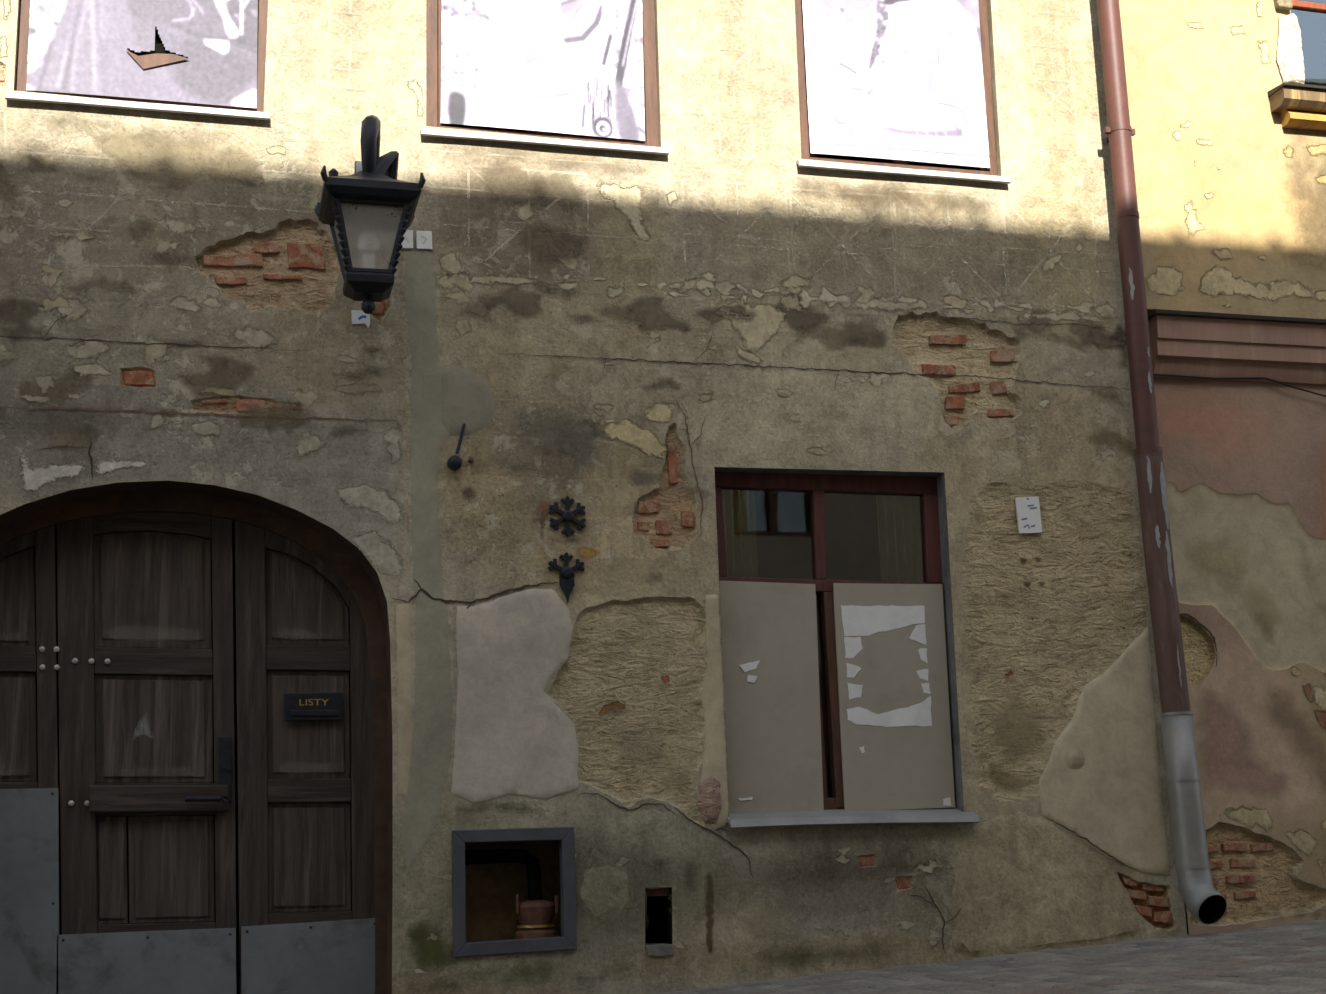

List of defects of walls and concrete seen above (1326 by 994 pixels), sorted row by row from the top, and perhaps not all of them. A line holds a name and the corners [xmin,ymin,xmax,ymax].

flaking render [596,181,651,241]
flaking render [62,335,186,388]
flaking render [131,213,358,456]
flaking render [434,203,1126,430]
flaking render [18,454,147,491]
flaking render [336,483,405,578]
crack [392,579,559,609]
flaking render [585,400,710,551]
flaking render [961,431,1326,802]
flaking render [548,596,707,827]
crack [581,793,754,878]
flaking render [1117,804,1326,931]